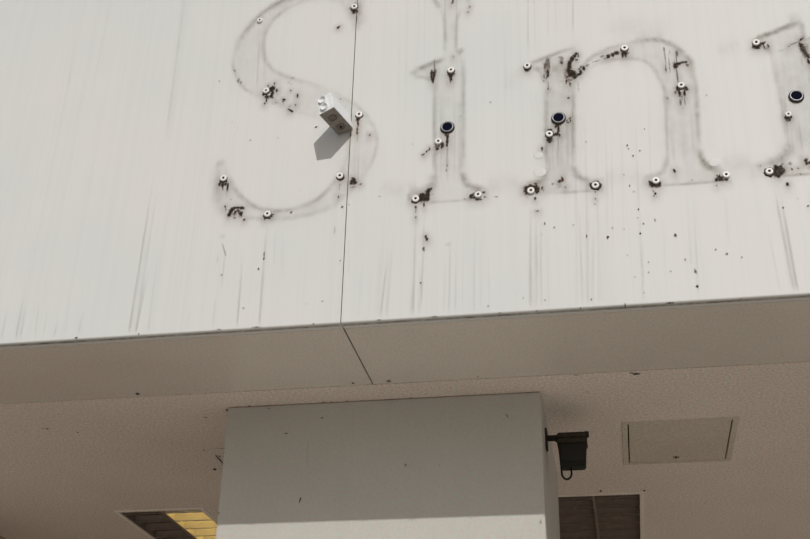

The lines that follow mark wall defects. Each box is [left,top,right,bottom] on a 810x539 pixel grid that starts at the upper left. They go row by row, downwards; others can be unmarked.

rust [561,52,585,85]
rust [411,188,432,218]